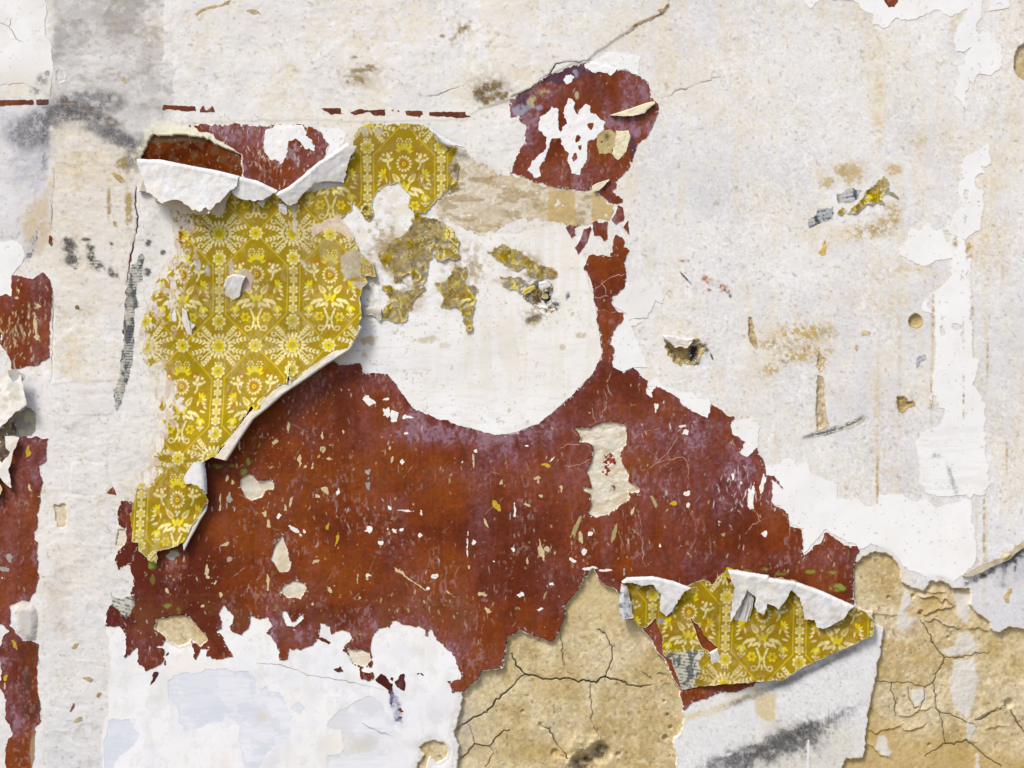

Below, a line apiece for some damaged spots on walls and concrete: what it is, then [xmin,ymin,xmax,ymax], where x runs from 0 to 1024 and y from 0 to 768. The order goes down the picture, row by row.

peeling [142,123,346,191]
peeling [509,51,659,254]
peeling [101,235,1024,768]
crack [459,629,662,761]
crack [877,620,1023,765]